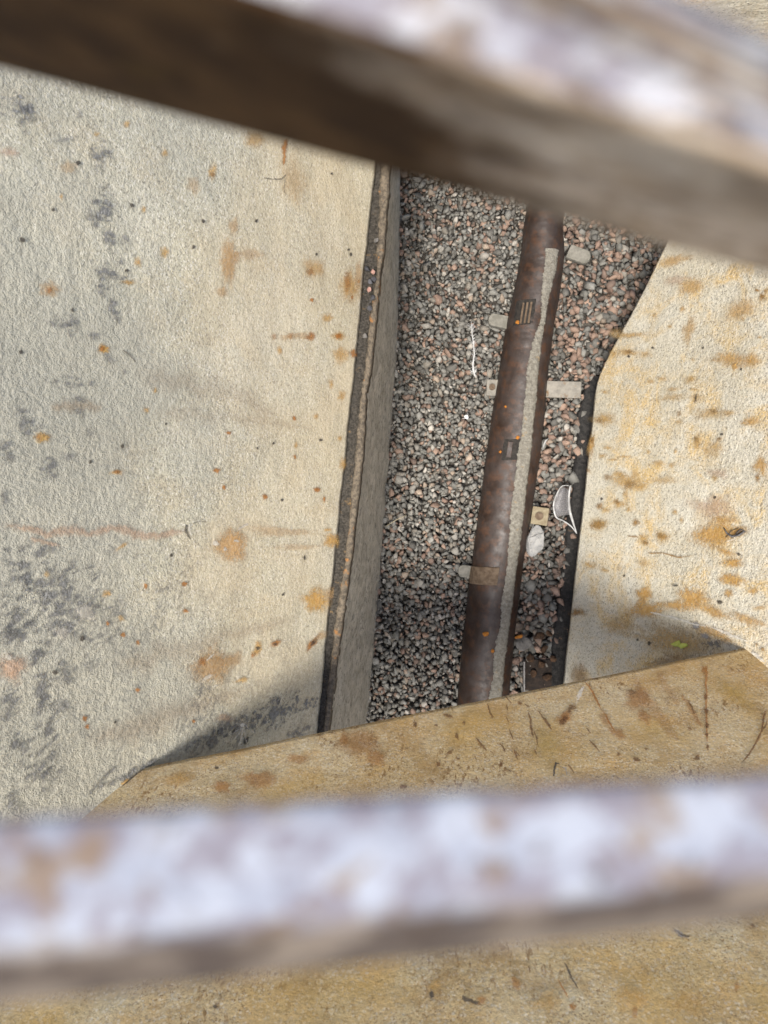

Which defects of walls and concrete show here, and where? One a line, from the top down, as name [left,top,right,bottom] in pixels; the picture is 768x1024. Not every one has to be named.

corrosion [221,242,237,282]
corrosion [613,472,667,544]
corrosion [212,523,248,562]
corrosion [693,517,756,597]
corrosion [303,587,329,610]
corrosion [636,588,651,605]
corrosion [666,588,763,625]